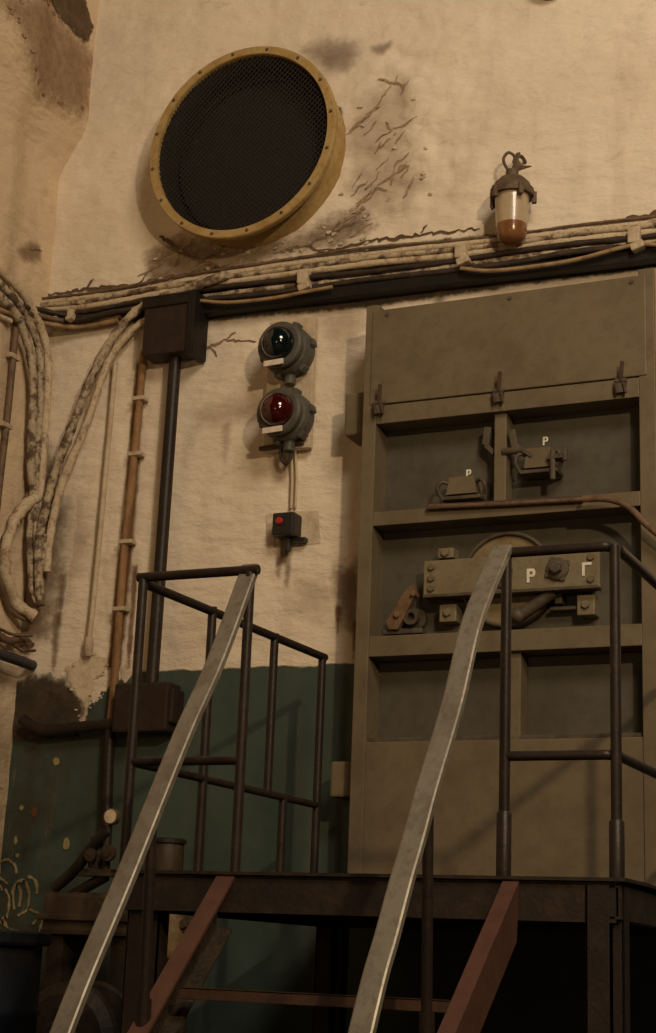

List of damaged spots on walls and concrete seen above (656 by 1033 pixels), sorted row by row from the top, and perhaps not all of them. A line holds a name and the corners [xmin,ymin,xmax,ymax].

crack [378,77,405,86]
water stain [12,456,85,745]